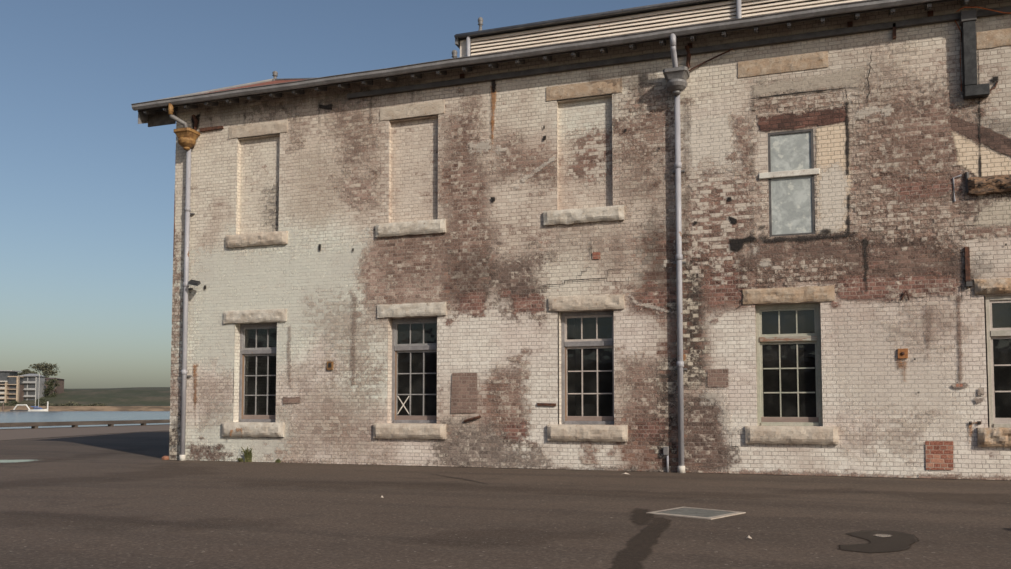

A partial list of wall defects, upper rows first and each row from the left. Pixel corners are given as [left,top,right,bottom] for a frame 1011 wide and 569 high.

crack [751,51,873,102]
peeling [319,90,382,211]
peeling [354,75,1011,473]